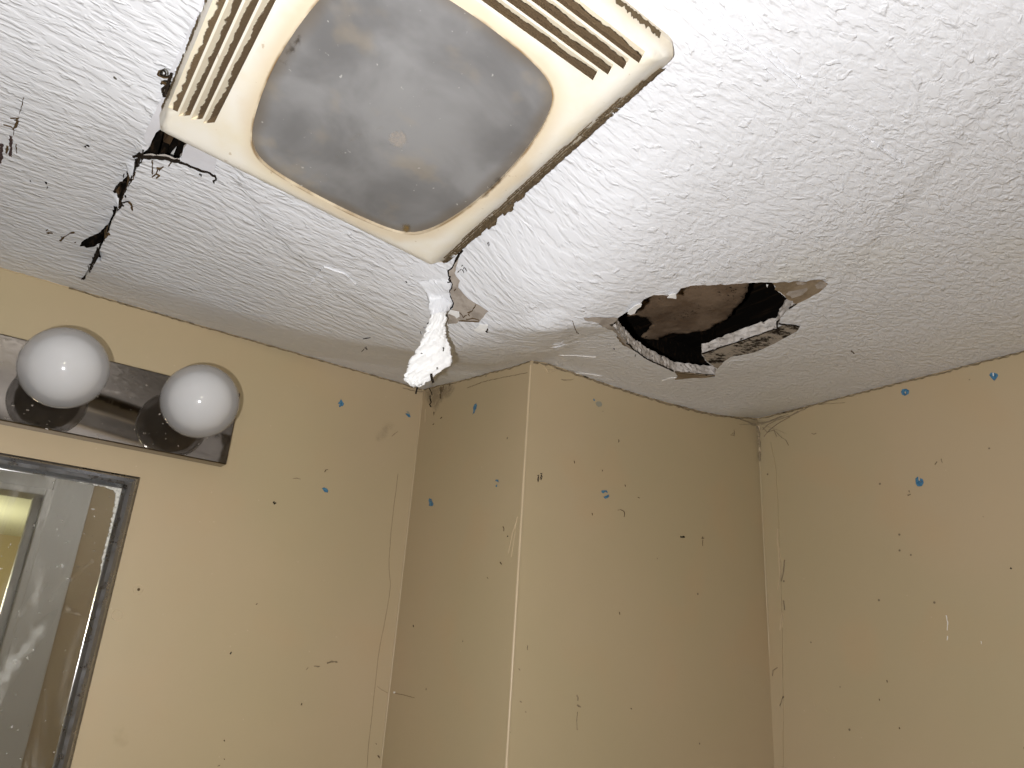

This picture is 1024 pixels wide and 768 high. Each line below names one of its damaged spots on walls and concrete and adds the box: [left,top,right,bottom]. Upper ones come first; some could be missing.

peeling [403,250,488,394]
crack [0,130,1024,425]
spalling [613,281,827,380]